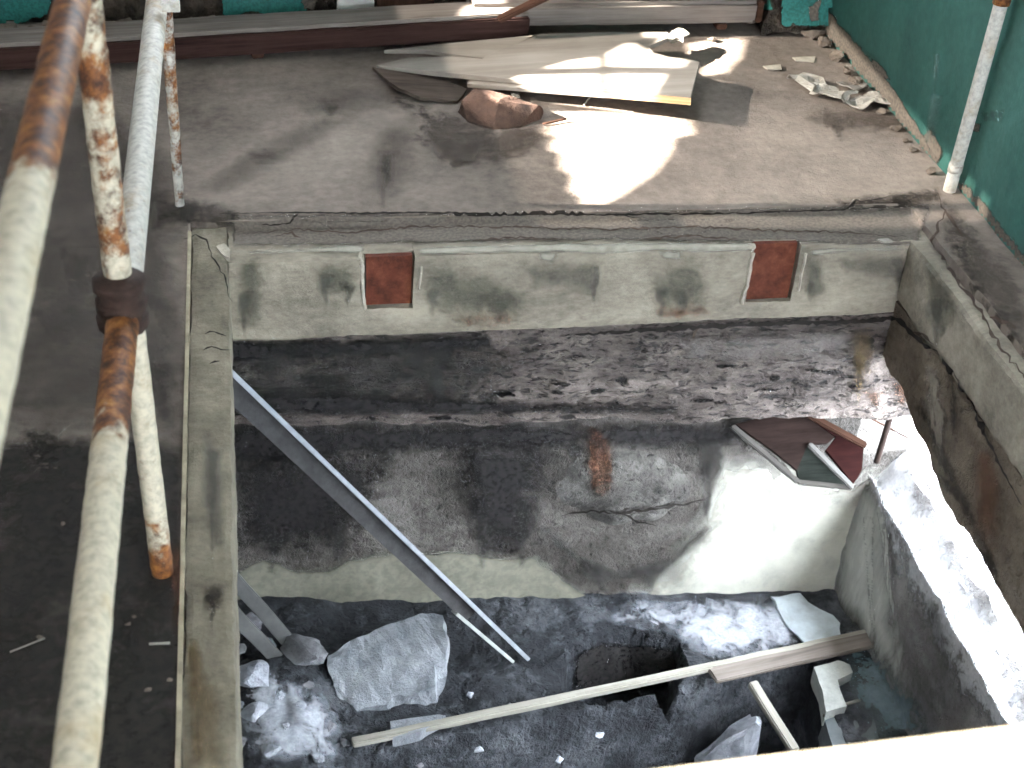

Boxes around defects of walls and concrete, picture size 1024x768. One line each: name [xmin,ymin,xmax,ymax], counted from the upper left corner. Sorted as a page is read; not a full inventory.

crack [184,194,1024,378]
spalling [805,369,864,388]
corrosion [588,427,613,497]
crack [563,495,715,526]